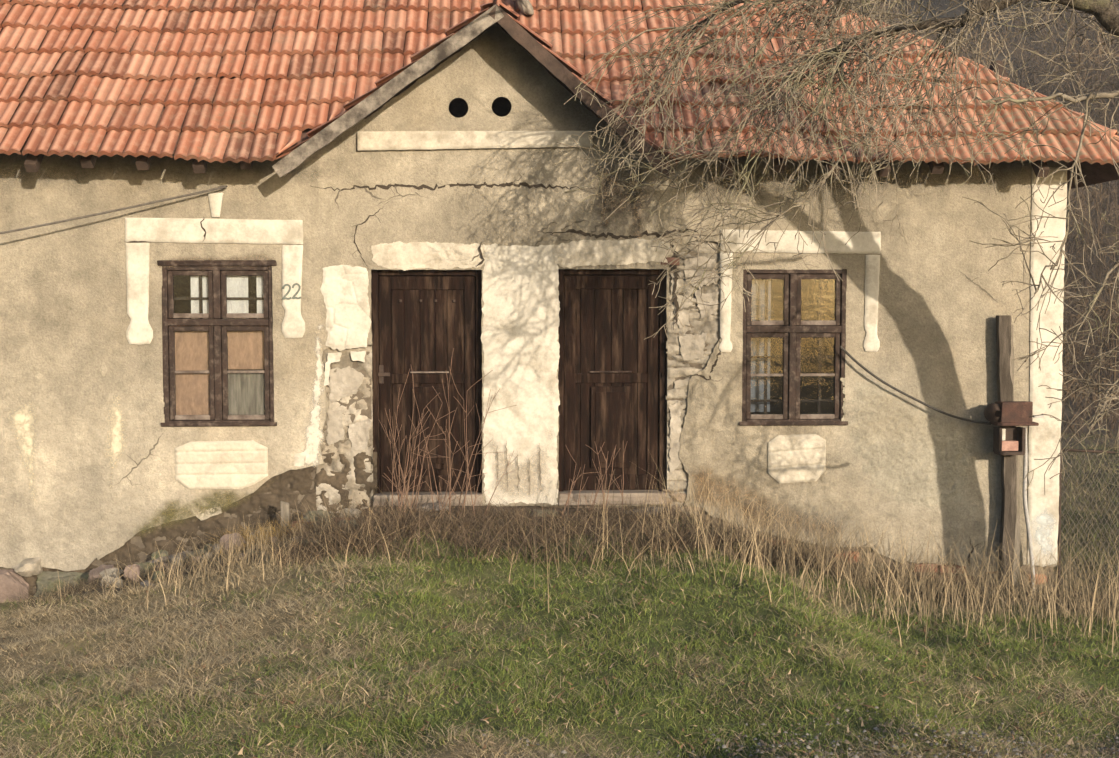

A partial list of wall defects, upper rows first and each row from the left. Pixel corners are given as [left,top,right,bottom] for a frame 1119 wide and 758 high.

crack [311,170,596,269]
crack [535,220,711,330]
crack [119,432,164,486]
spalling [19,265,378,599]
crack [684,334,722,382]
spalling [663,240,997,586]